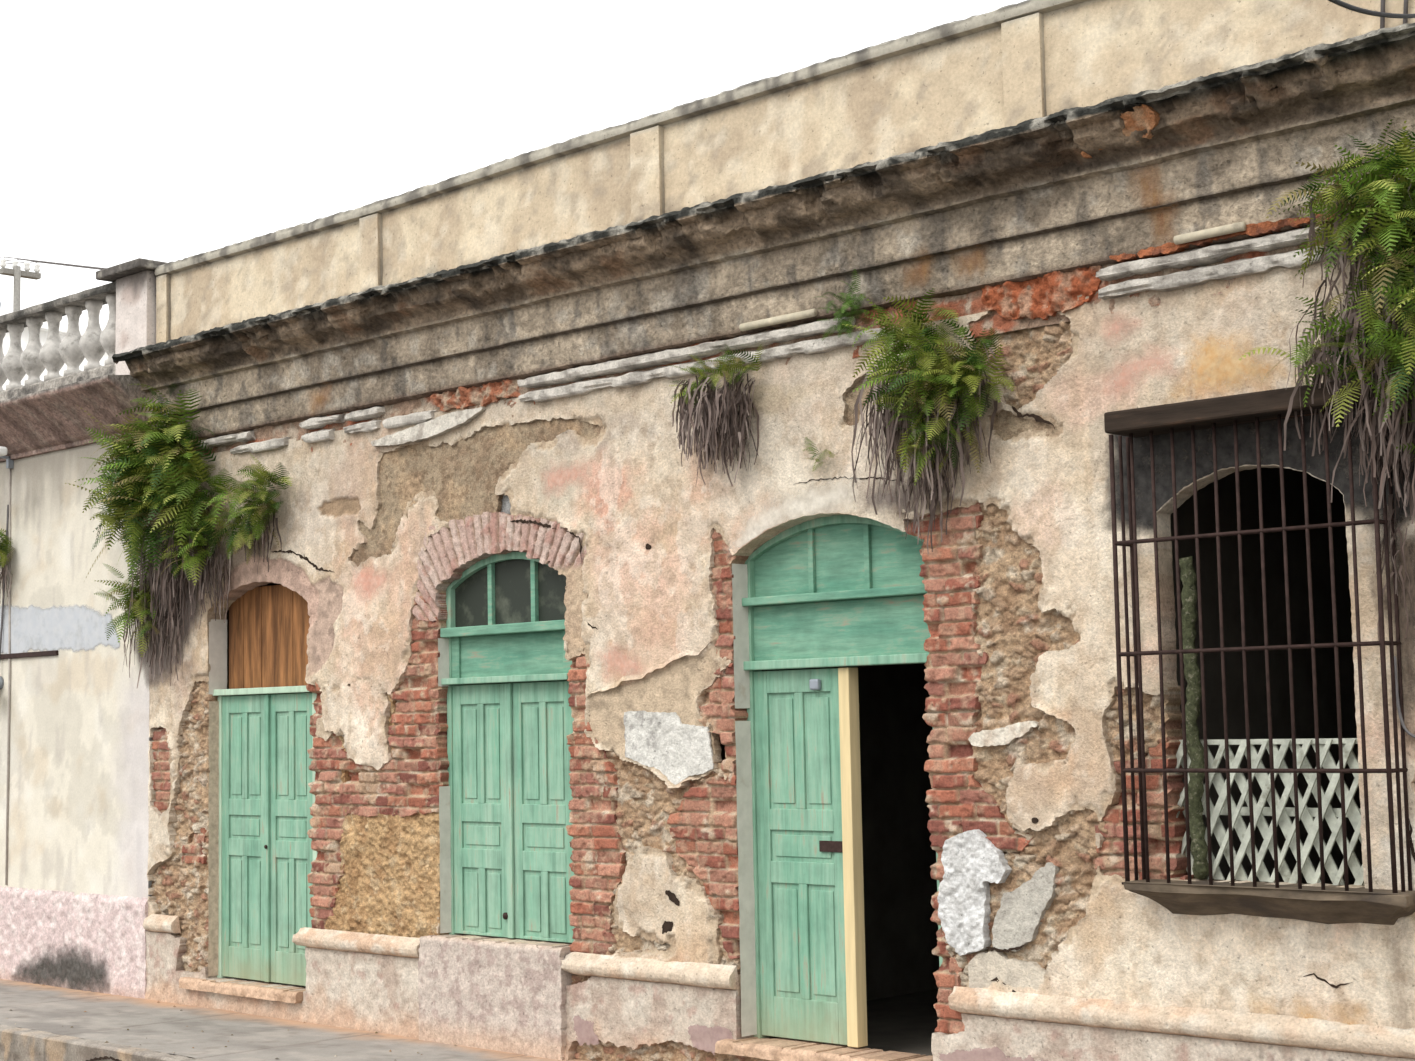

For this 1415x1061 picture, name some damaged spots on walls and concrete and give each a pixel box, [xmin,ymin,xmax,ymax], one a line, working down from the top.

spalling [151,678,228,972]
spalling [306,418,749,975]
spalling [571,974,591,985]
spalling [906,502,1195,1034]
crack [1407,819,1415,861]